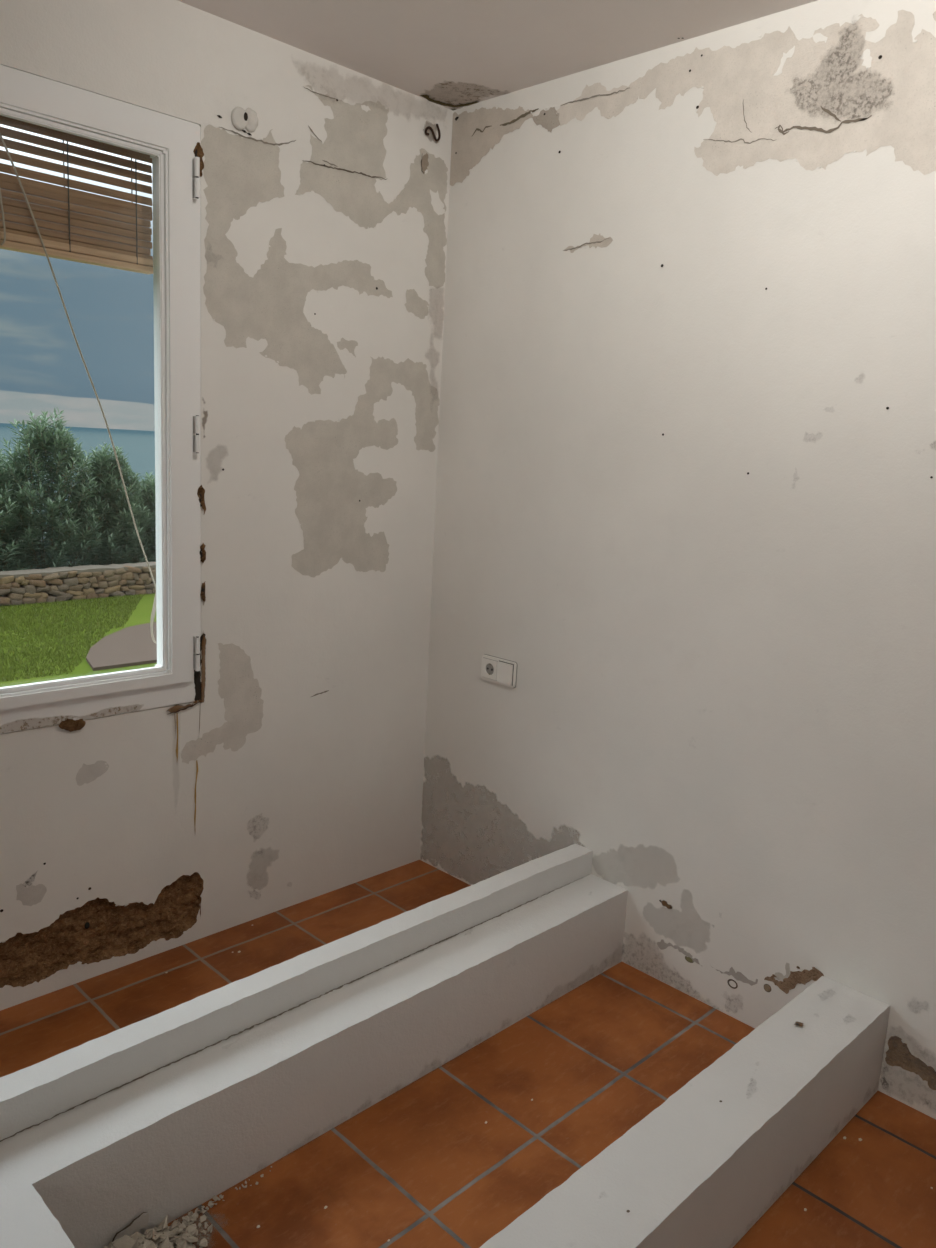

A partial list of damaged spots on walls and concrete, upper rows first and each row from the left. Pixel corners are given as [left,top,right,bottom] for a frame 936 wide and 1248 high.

damp [796,30,892,118]
crack [703,100,872,144]
peeling [193,10,936,395]
spalling [197,485,206,514]
peeling [285,357,440,577]
rust [167,699,203,760]
peeling [181,633,264,764]
spalling [0,872,204,988]
spalling [657,939,824,994]
spalling [885,1036,936,1090]